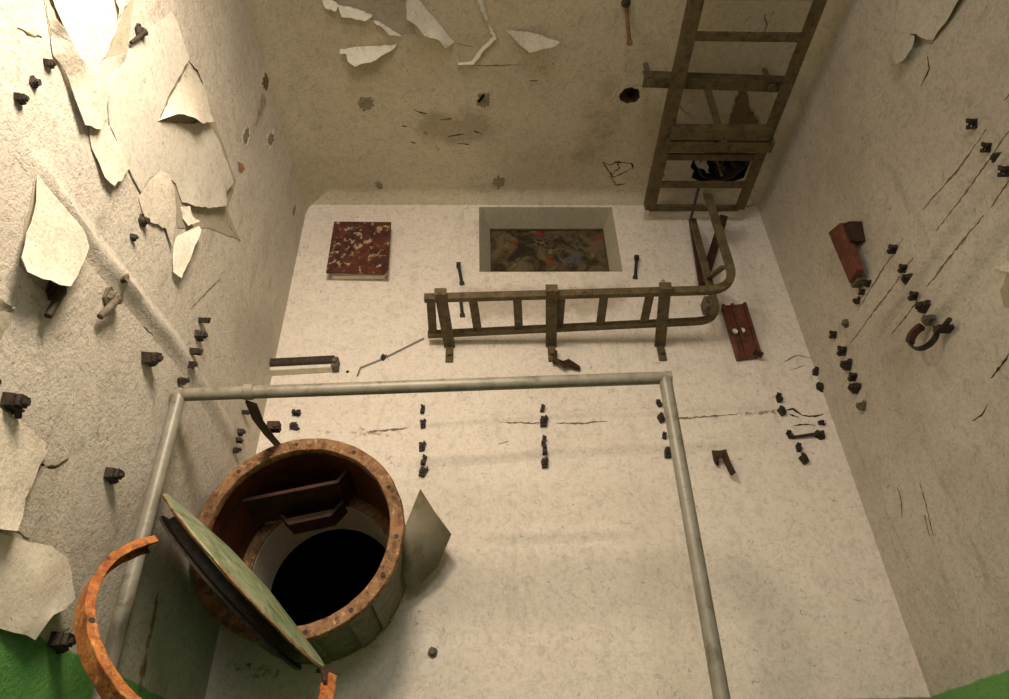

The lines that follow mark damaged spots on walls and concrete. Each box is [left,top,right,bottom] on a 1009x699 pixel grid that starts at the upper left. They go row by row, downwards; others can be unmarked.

peeling [321,0,560,67]
peeling [891,0,967,64]
peeling [44,0,240,278]
crack [922,129,1009,231]
peeling [20,175,89,290]
crack [851,239,913,343]
crack [892,181,1009,334]
peeling [993,262,1009,308]
crack [991,354,1009,378]
peeling [0,408,80,646]